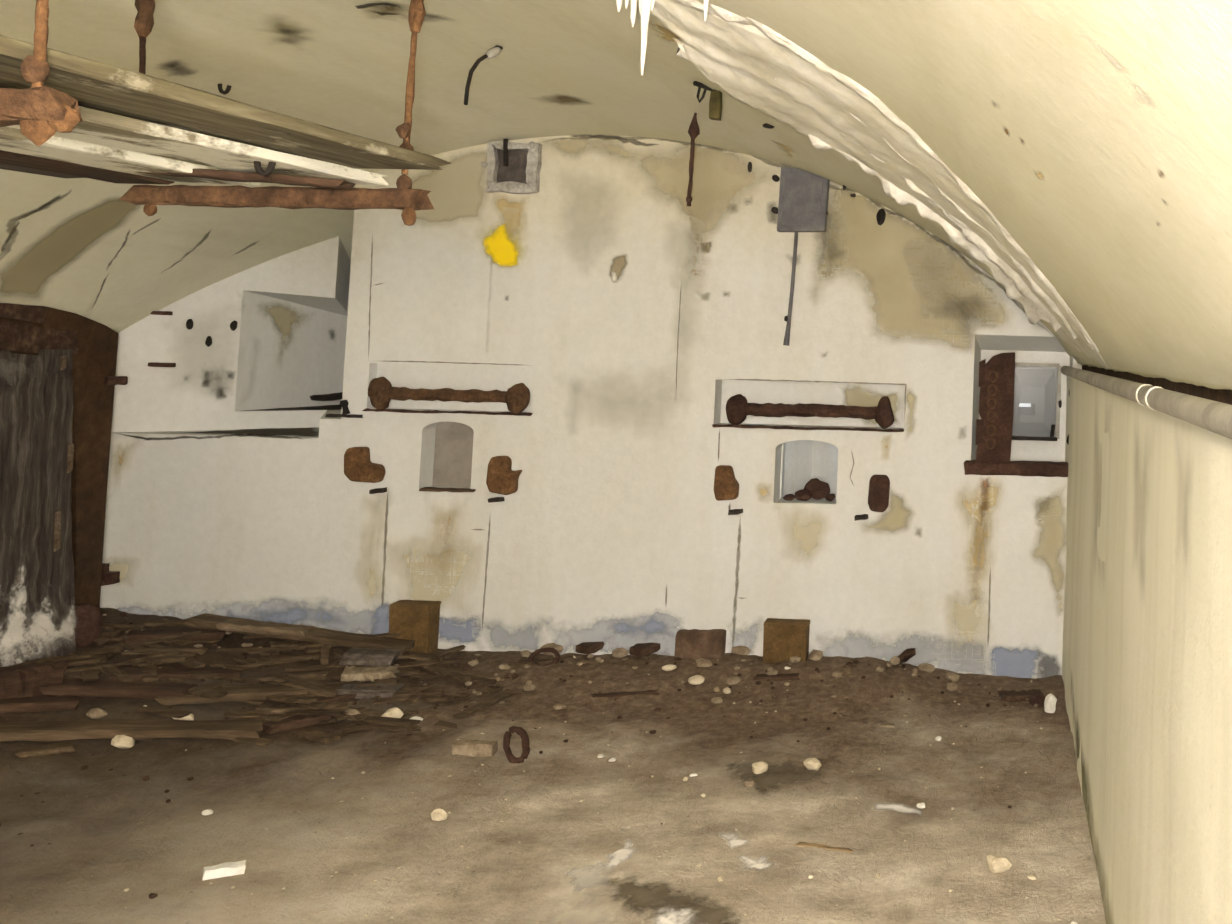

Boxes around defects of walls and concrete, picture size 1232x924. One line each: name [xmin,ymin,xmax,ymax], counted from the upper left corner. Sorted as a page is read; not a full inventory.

crack [1,194,68,253]
crack [92,220,158,308]
crack [166,232,209,270]
damp [642,146,754,273]
damp [820,190,1004,348]
corrosion [973,482,996,565]